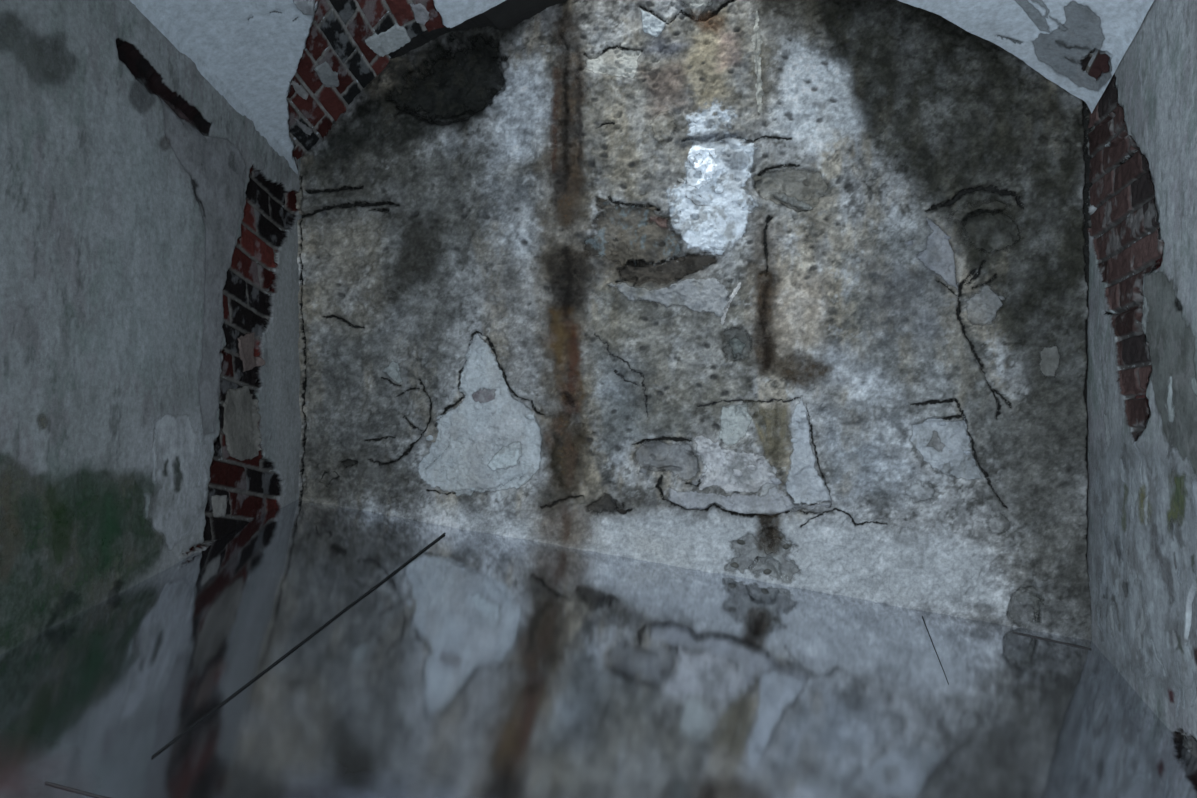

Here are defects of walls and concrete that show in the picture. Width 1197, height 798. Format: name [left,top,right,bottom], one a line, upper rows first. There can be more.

flaking render [286,0,508,166]
peeling [584,101,828,362]
flaking render [145,97,299,559]
crack [299,176,400,497]
crack [365,331,544,495]
spalling [418,334,542,496]
corrosion [545,308,584,493]
spalling [635,398,832,583]
crack [594,334,887,528]
corrosion [757,514,781,552]
corrosion [756,271,831,385]
crack [910,260,1012,508]